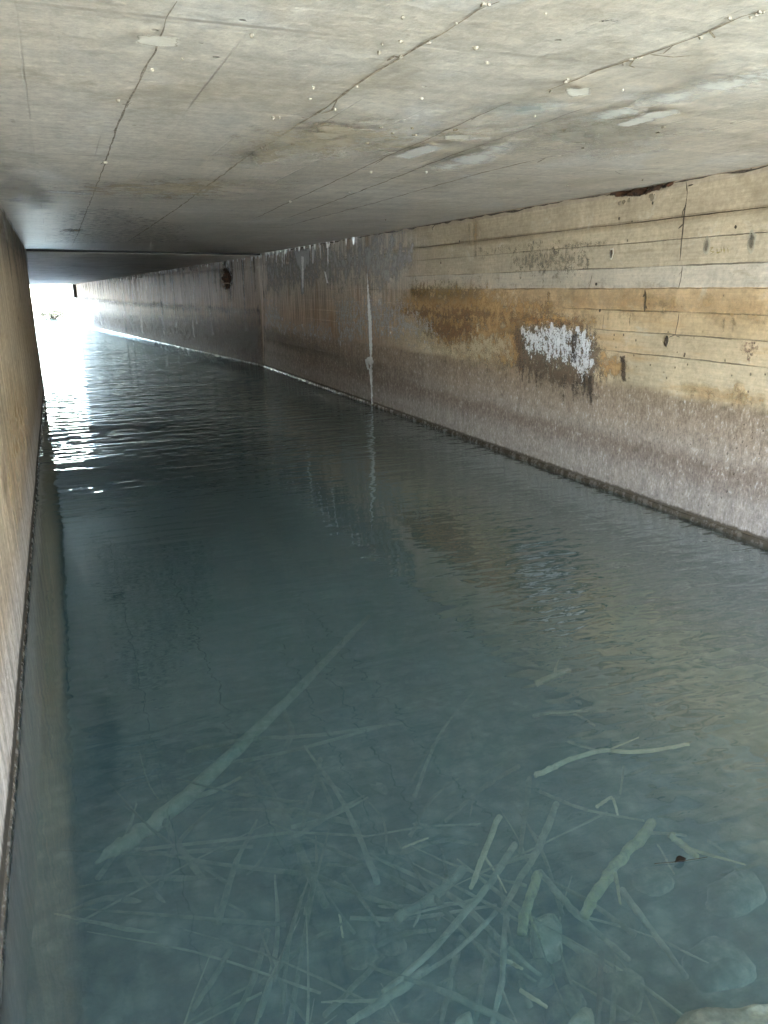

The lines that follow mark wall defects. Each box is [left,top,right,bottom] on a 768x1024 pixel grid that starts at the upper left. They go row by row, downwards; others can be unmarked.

crack [547,10,765,93]
crack [72,1,177,245]
crack [129,2,498,241]
spalling [526,165,768,208]
crack [678,183,693,289]
damp [77,232,413,404]
corrosion [390,284,596,373]
damp [513,323,602,405]